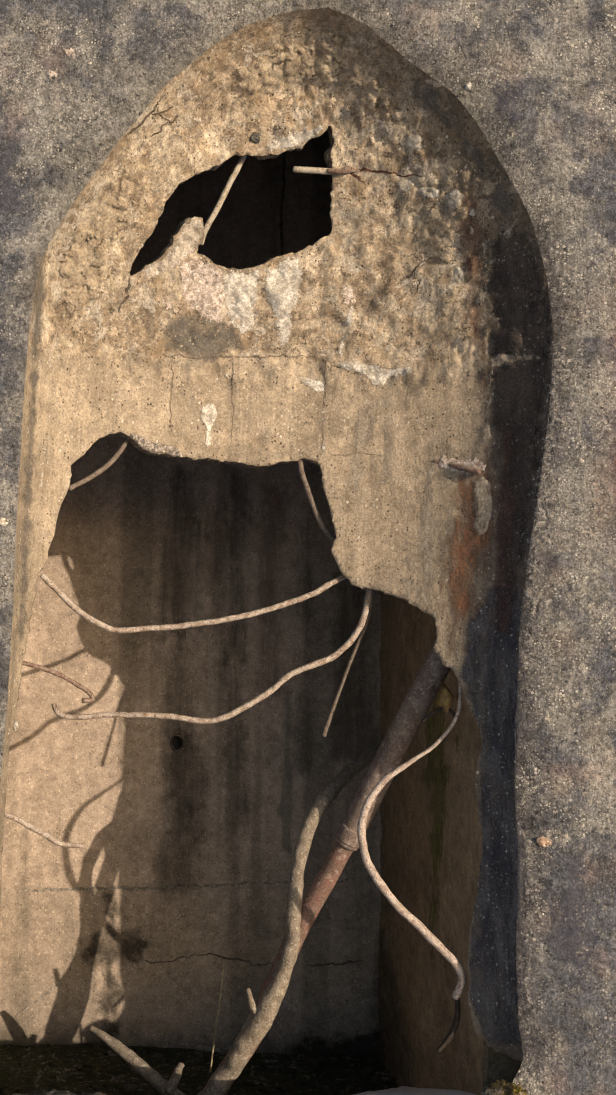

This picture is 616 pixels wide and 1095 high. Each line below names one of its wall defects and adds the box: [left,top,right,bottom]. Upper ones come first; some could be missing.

crack [126,95,178,137]
spalling [142,219,203,278]
peeling [300,377,325,393]
spalling [130,433,184,457]
peeling [481,424,491,445]
peeling [439,455,493,536]
corrosion [441,477,493,626]
leakage [341,579,360,649]
leakage [456,231,551,1043]
leakage [422,695,459,932]
leakage [82,894,147,1047]
crack [145,953,272,966]